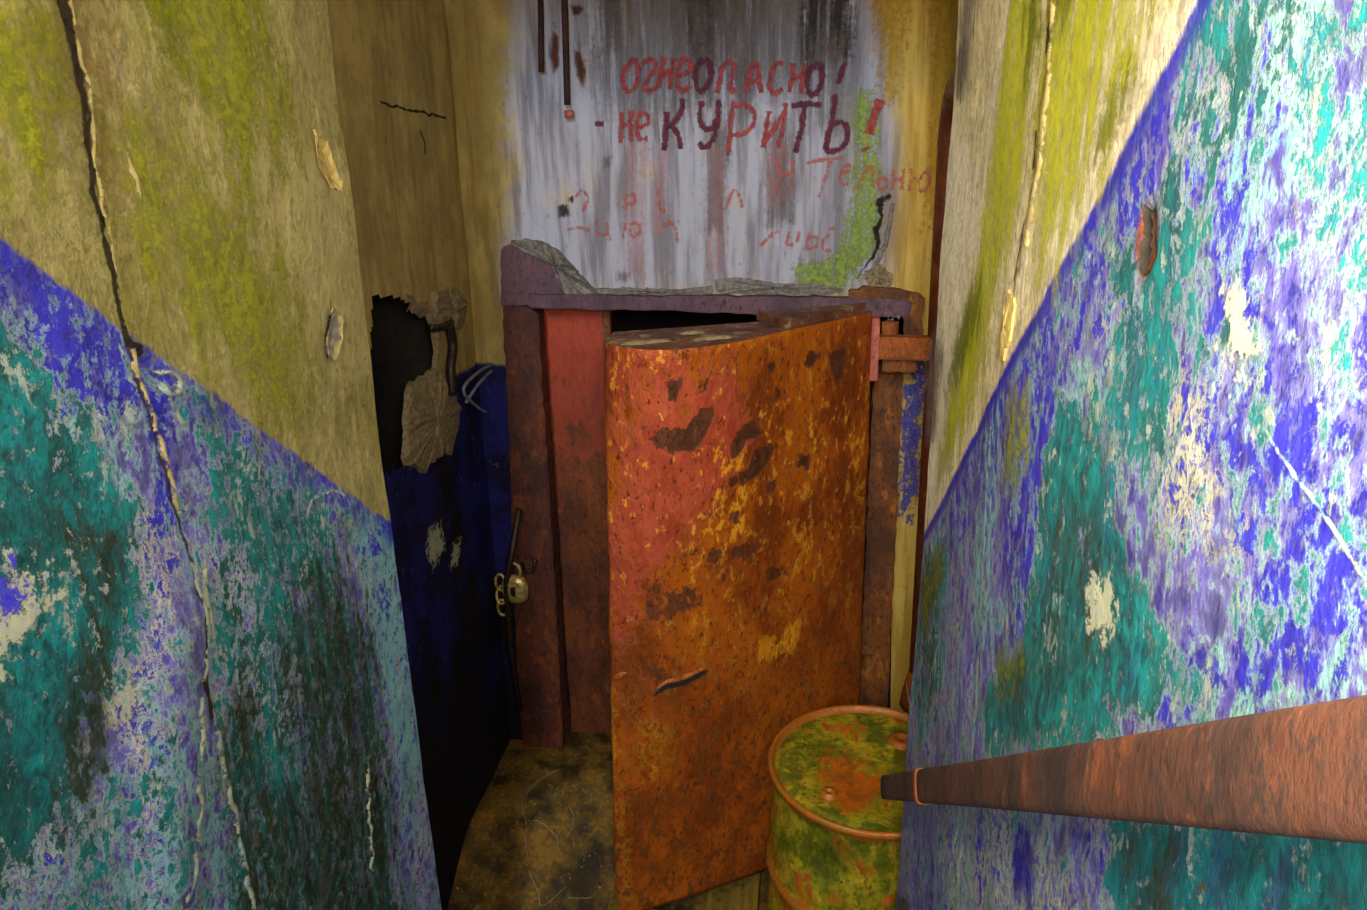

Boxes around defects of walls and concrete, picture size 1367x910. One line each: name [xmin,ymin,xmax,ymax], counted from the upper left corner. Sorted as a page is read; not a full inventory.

leakage [579,0,855,234]
leakage [873,0,911,101]
leakage [923,0,958,225]
crack [1012,0,1056,298]
crack [53,0,213,720]
peeling [1213,279,1265,363]
peeling [0,548,69,683]
peeling [1085,571,1120,651]